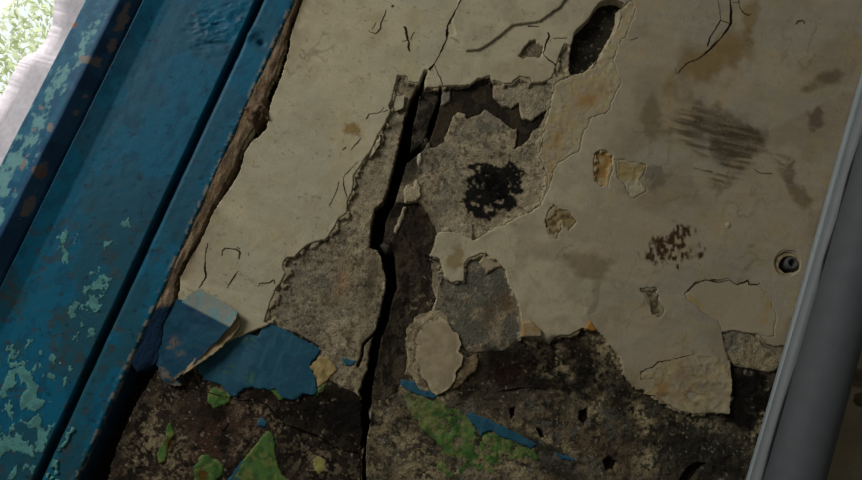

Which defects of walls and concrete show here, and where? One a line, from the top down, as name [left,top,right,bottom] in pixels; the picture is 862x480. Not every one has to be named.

crack [528,25,562,65]
crack [675,0,752,74]
mould [461,155,524,221]
peeling [56,229,78,266]
crack [178,0,461,480]
spalling [108,1,784,480]
corrosion [646,225,703,269]
peeling [67,266,113,342]
peeling [0,339,75,480]
mould [522,337,604,399]
damp [723,364,771,441]